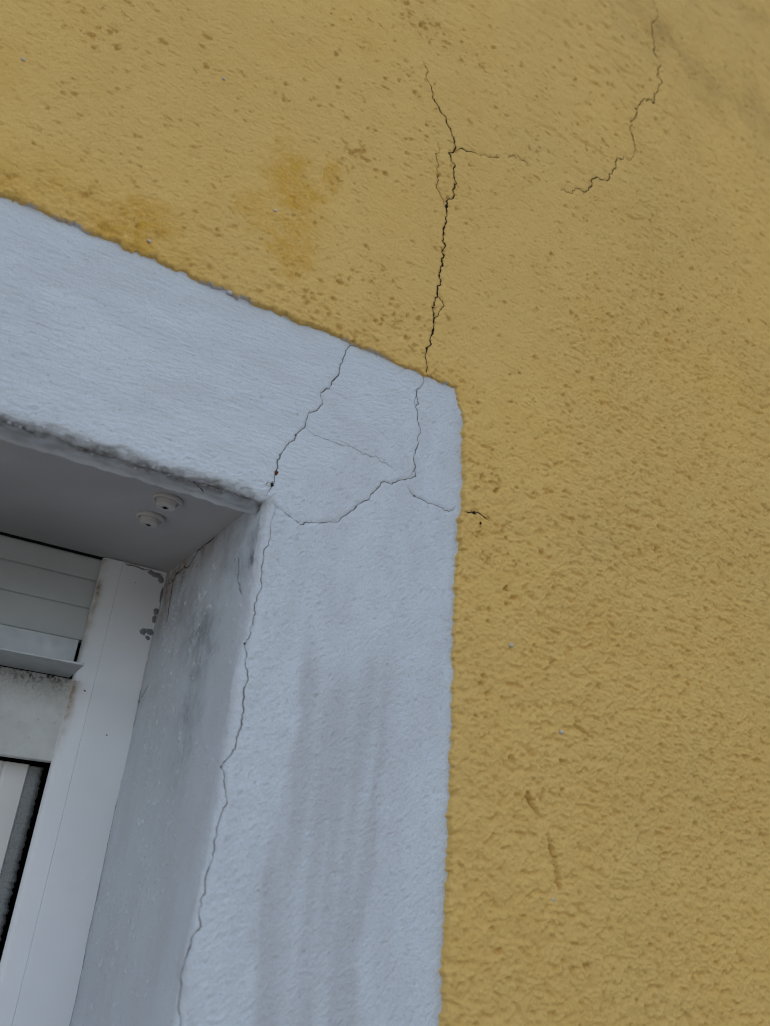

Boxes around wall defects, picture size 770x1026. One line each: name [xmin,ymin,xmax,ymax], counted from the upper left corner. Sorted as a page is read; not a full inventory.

crack [178,66,530,1026]
crack [562,0,663,194]